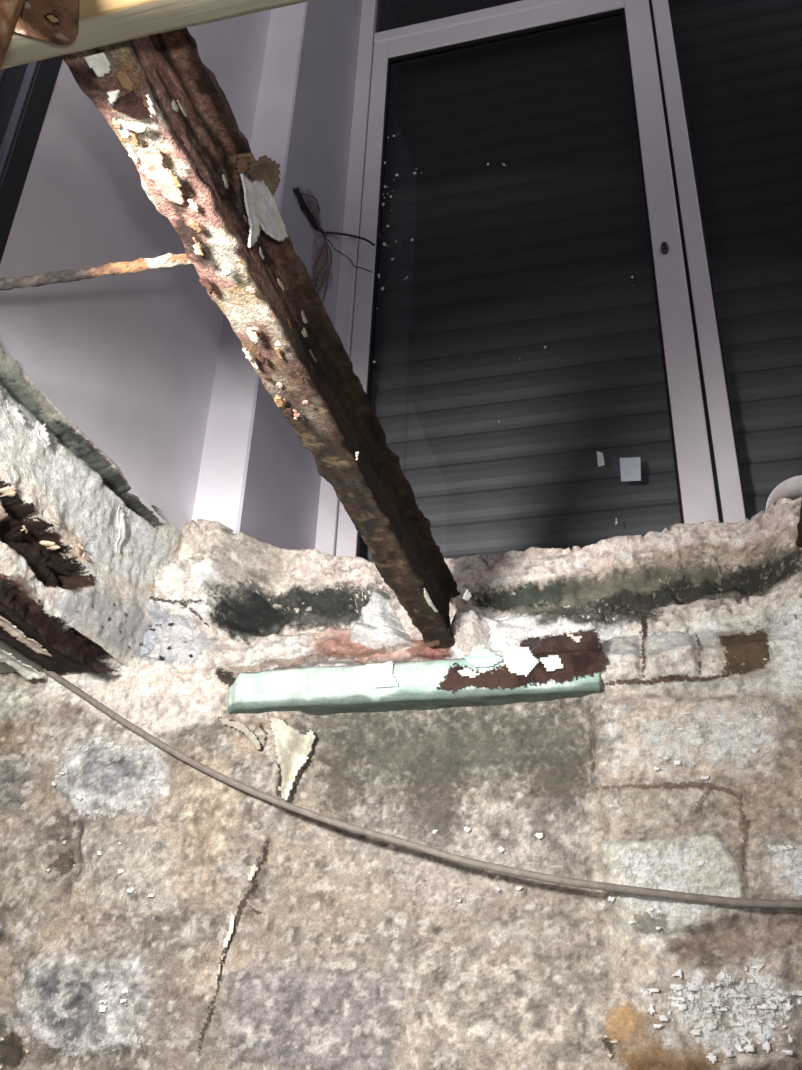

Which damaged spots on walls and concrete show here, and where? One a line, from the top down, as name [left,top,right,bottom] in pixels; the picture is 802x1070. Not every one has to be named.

peeling [84,52,204,256]
peeling [0,648,44,680]
rust [0,574,119,674]
peeling [0,478,220,664]
damp [207,581,394,645]
peeling [207,640,440,689]
rust [308,627,450,664]
peeling [436,627,608,693]
damp [471,547,802,628]
spalling [719,629,770,677]
crack [197,841,269,1055]
rust [608,1002,722,1070]